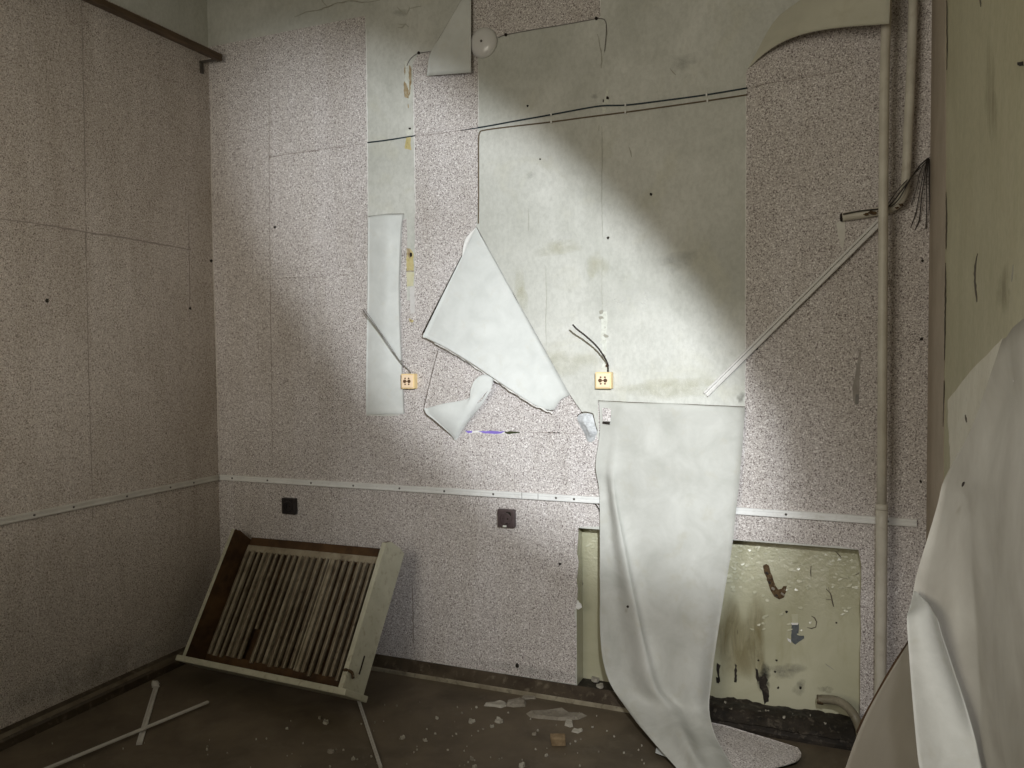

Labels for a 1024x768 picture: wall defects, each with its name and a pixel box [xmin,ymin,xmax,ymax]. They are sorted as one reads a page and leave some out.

flaking render [365,0,890,440]
peeling [948,338,1003,467]
rust [763,564,787,599]
water stain [755,668,769,704]